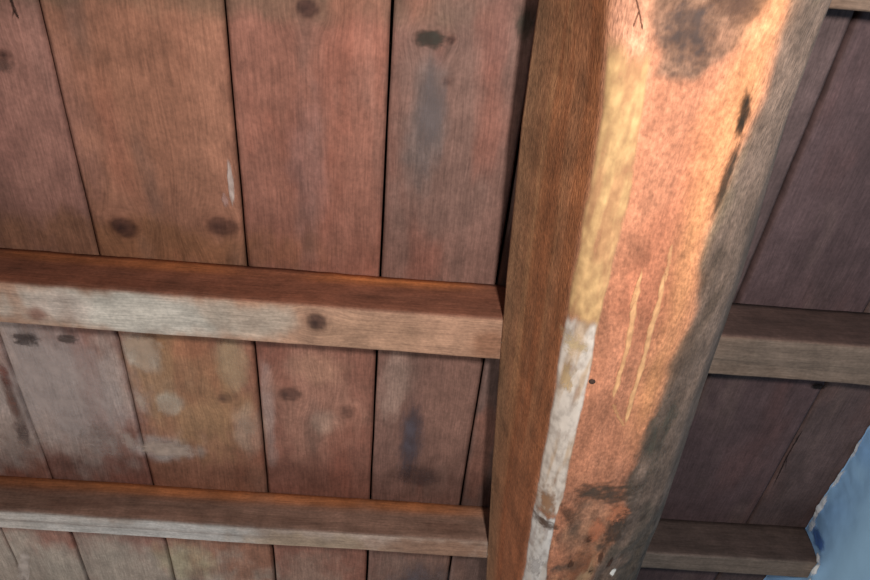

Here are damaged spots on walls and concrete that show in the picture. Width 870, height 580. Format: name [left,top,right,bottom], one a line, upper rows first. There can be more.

leakage [671,10,705,55]
peeling [523,52,648,580]
leakage [579,485,631,504]